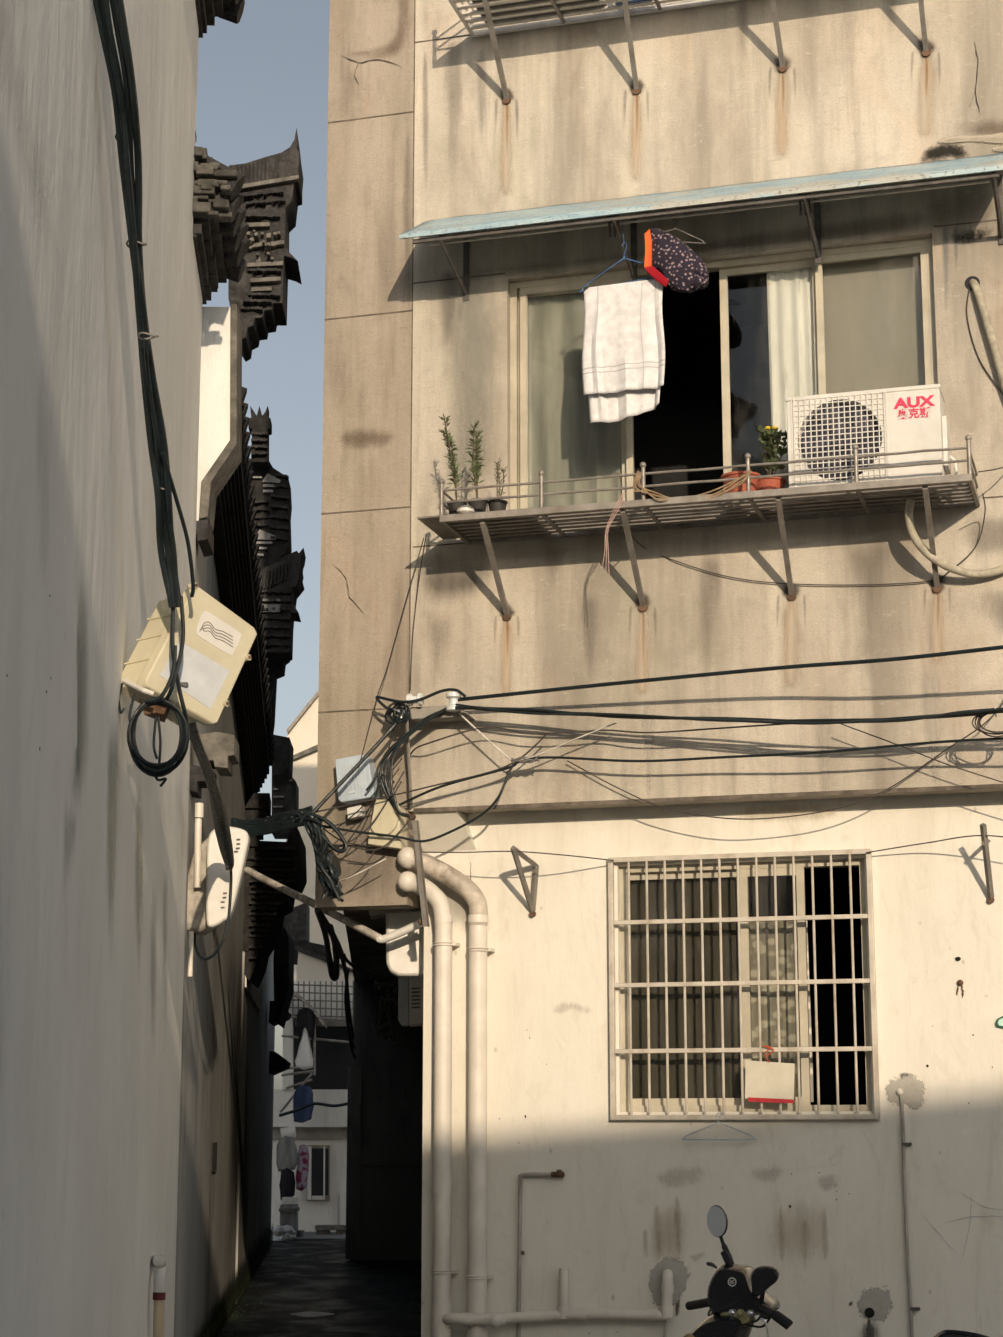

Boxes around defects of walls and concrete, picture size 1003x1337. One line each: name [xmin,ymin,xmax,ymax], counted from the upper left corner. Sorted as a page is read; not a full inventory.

crack [345,57,399,82]
corrosion [502,89,513,192]
corrosion [631,81,643,178]
corrosion [775,57,789,154]
corrosion [919,40,934,133]
corrosion [502,605,514,693]